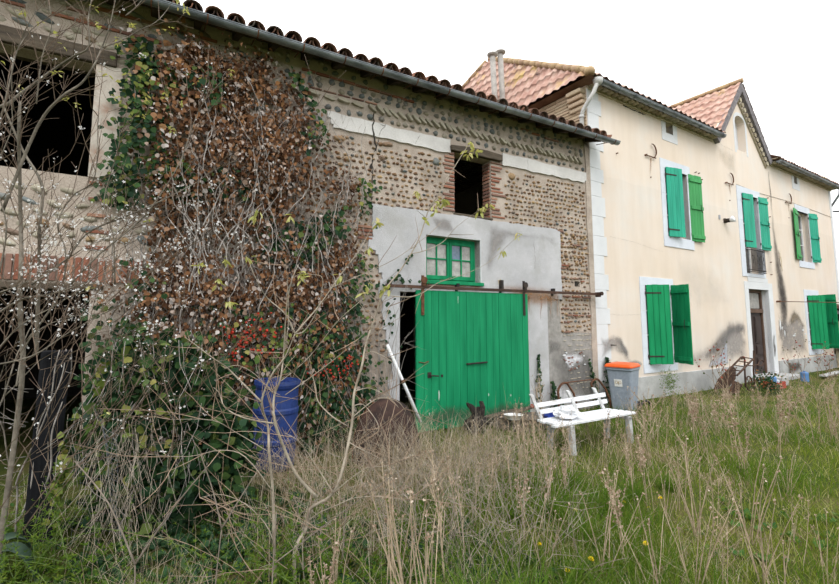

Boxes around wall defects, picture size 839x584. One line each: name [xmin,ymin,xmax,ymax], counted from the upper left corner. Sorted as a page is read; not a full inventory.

water stain [775,245,804,350]
water stain [605,339,637,363]
water stain [706,326,745,366]